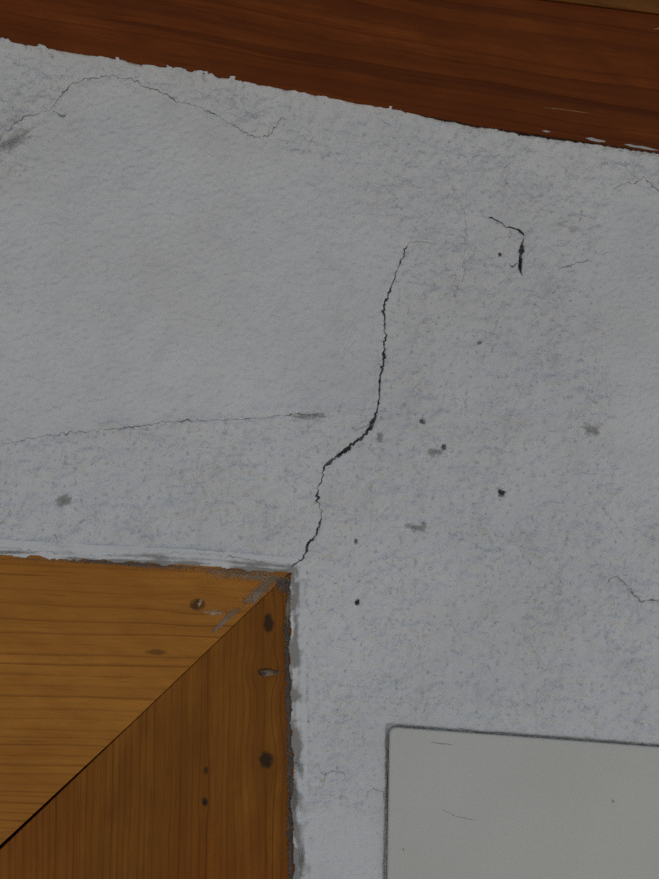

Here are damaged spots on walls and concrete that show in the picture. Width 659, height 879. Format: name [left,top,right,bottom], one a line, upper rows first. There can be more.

crack [292,242,411,567]
crack [488,217,524,275]